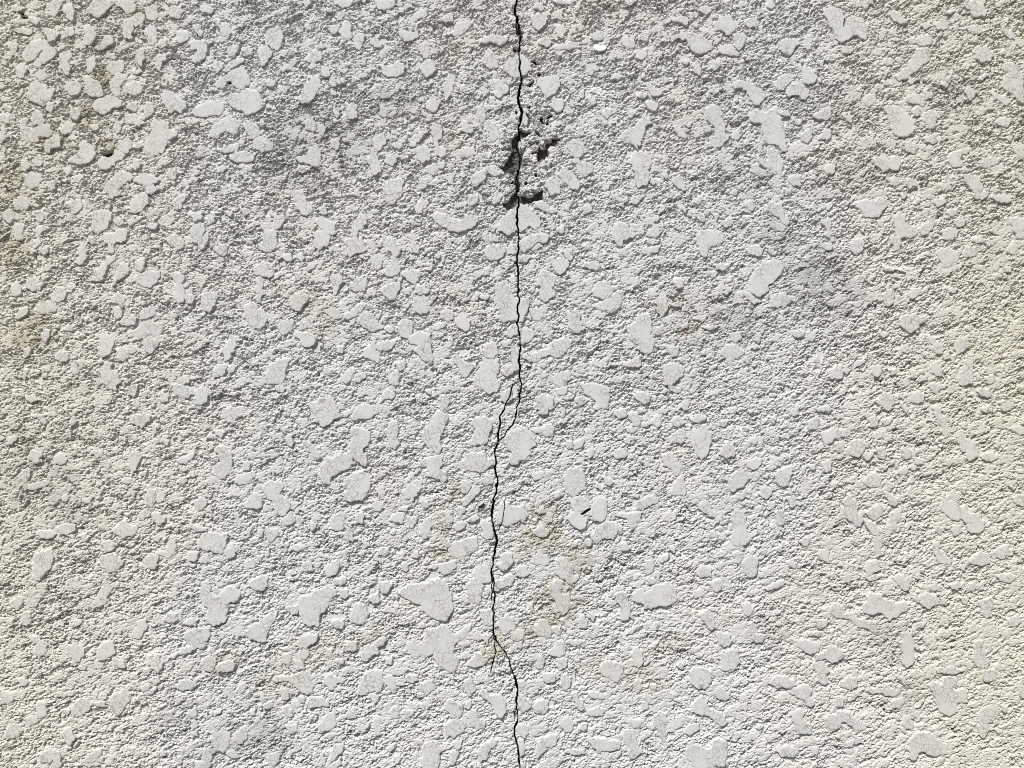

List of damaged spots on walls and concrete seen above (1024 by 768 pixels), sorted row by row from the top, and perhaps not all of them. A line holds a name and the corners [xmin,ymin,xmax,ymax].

crack [490,0,523,764]
spalling [498,131,560,211]